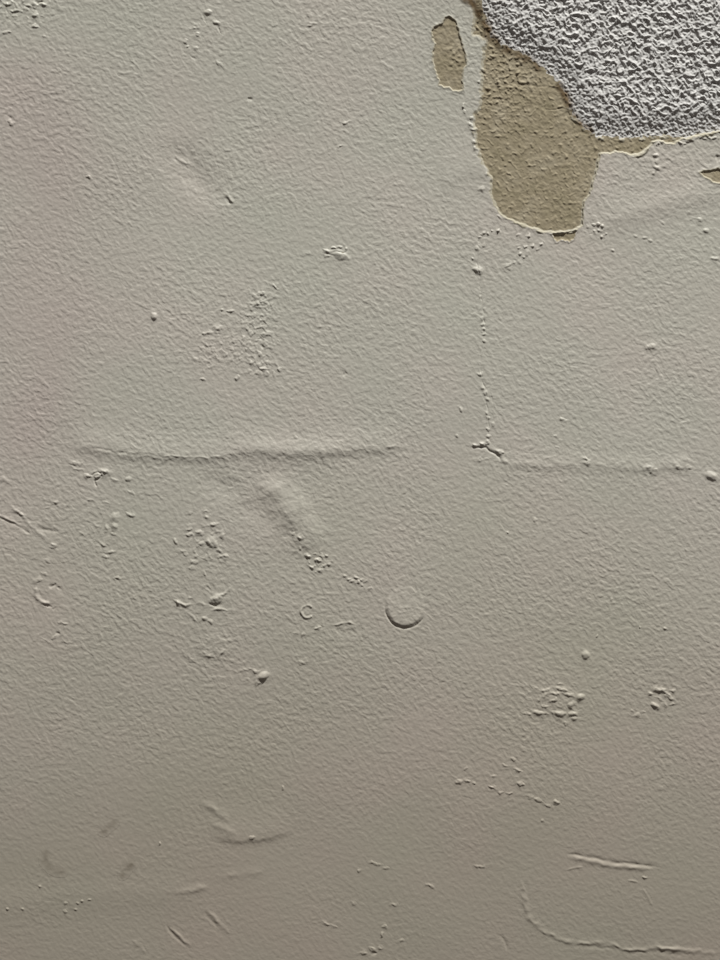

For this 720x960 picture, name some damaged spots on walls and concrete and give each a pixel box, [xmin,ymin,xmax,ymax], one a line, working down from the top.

spalling [428,0,720,272]
crack [132,418,408,480]
crack [454,239,698,477]
crack [517,875,720,957]